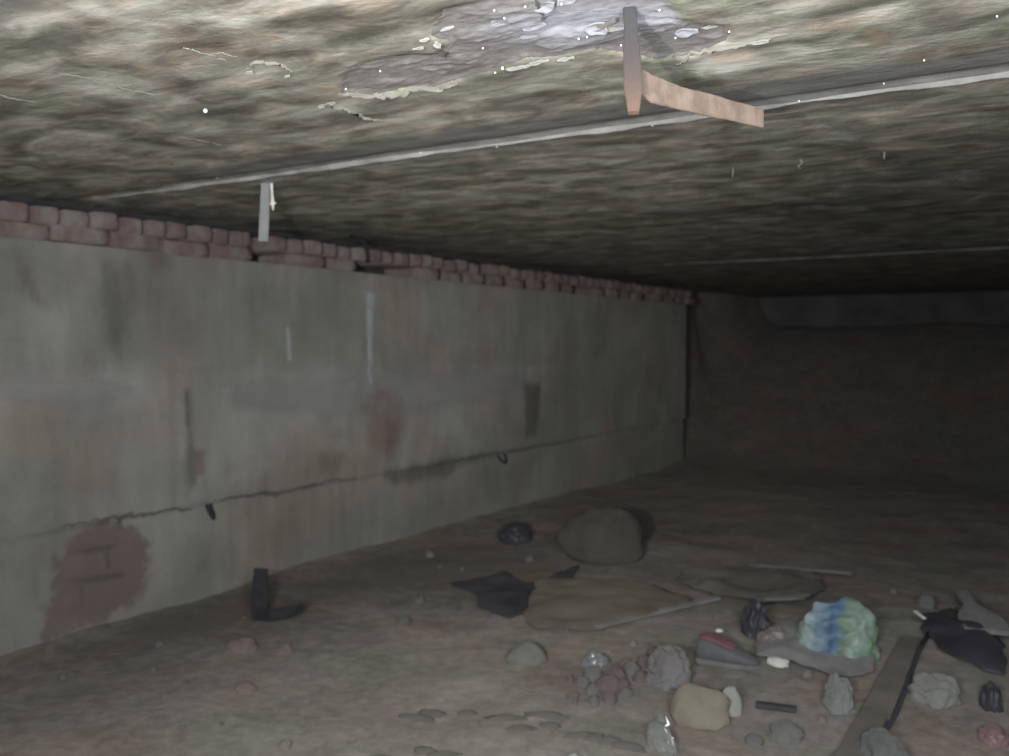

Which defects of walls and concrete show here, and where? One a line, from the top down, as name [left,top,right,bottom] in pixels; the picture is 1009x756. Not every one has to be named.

spalling [317,0,771,121]
crack [219,478,357,501]
crack [60,507,193,530]